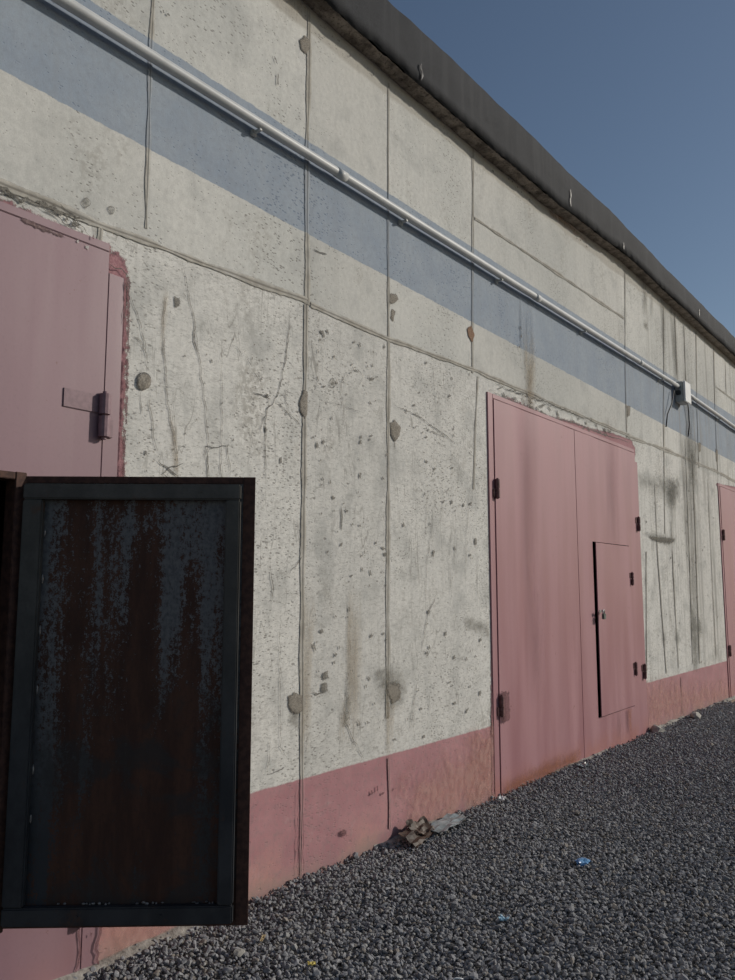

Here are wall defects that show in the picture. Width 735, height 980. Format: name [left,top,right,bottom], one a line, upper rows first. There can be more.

crack [111,259,231,477]
crack [256,316,298,478]
rust [3,476,255,929]